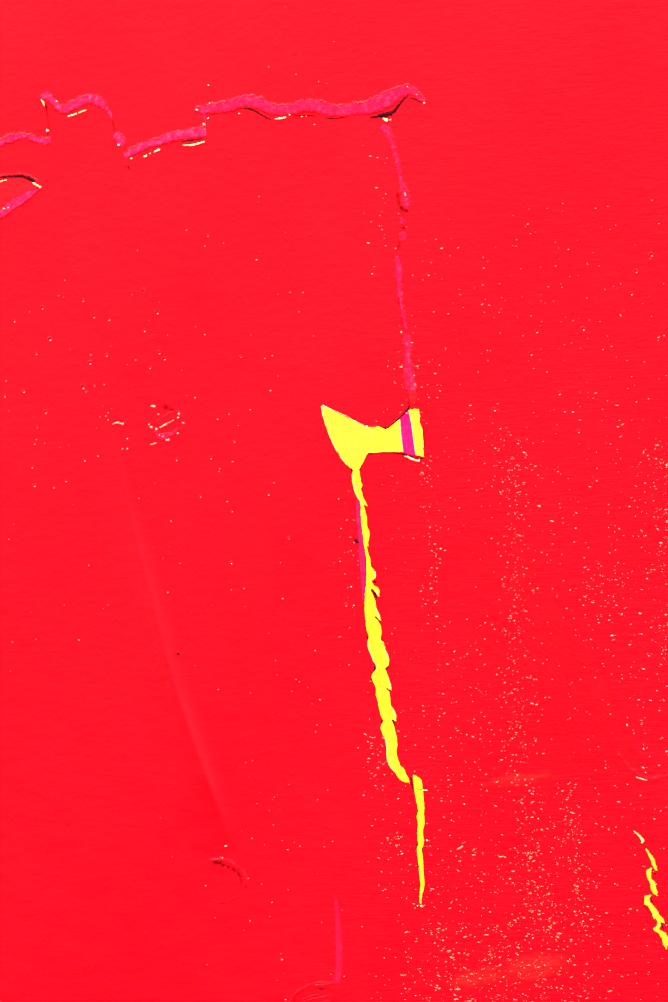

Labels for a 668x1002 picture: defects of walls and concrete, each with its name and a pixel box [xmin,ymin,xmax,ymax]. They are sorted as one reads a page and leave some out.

crack [0,83,427,404]
peeling [321,404,428,907]